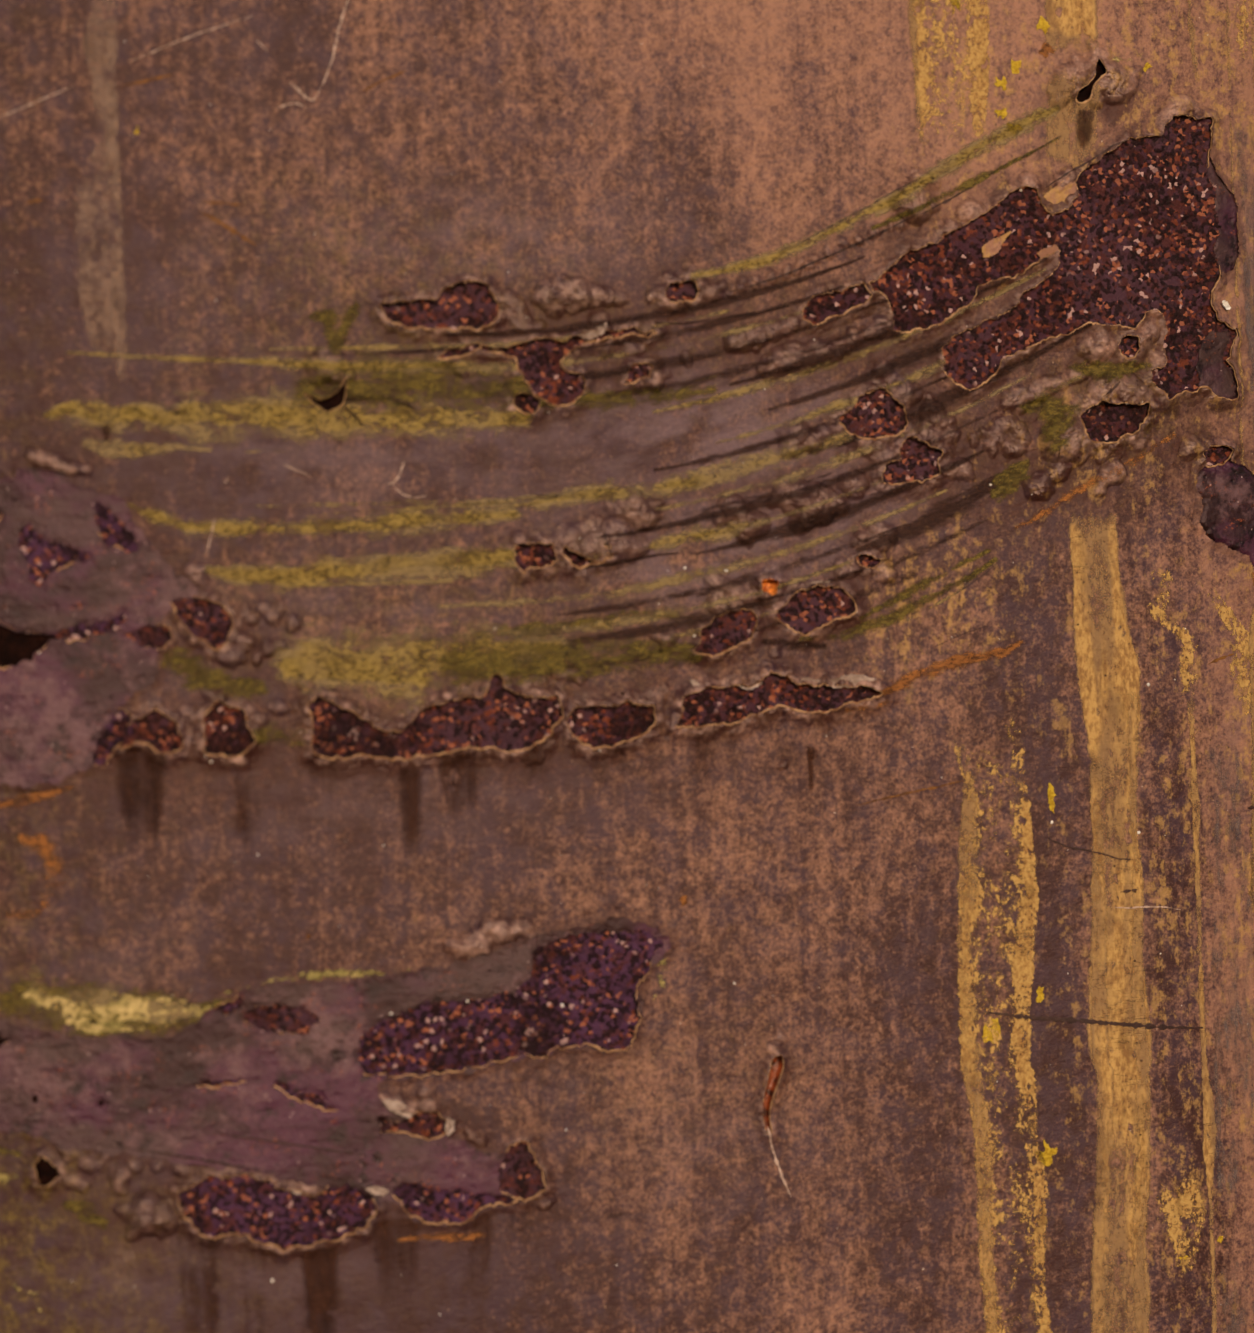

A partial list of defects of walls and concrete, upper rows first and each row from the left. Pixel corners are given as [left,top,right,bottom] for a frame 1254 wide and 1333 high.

water stain [43,341,553,458]
peeling [0,447,901,799]
water stain [126,430,873,537]
water stain [162,531,850,712]
water stain [562,329,921,413]
water stain [650,481,881,550]
water stain [831,549,998,640]
peeling [785,95,1249,503]
peeling [1182,431,1254,583]
water stain [1069,516,1254,1333]
peeling [0,908,680,1266]
water stain [954,721,1053,1333]